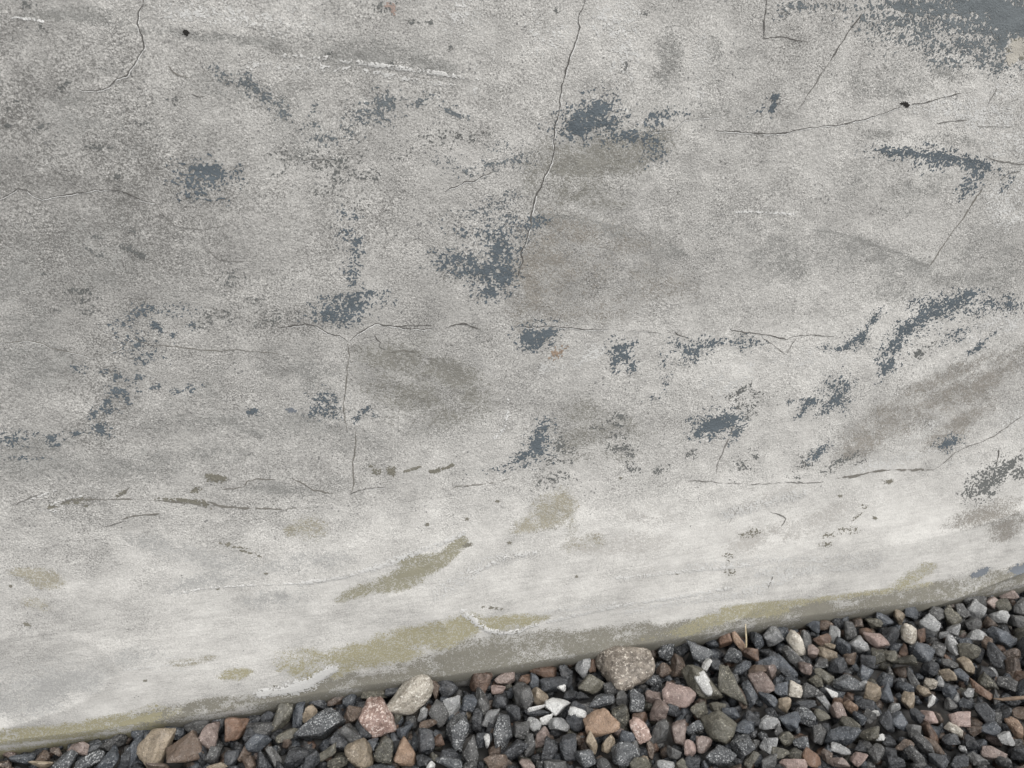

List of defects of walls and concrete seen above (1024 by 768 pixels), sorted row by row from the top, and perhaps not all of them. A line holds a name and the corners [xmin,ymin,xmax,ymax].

crack [79,5,146,92]
crack [517,2,585,277]
peeling [538,60,691,170]
crack [632,14,1013,136]
peeling [855,140,1021,202]
peeling [0,61,553,462]
peeling [786,284,1024,421]
crack [0,323,480,527]
peeling [684,379,767,472]
crack [658,416,1022,523]
leakage [108,531,363,613]
leakage [0,644,172,724]